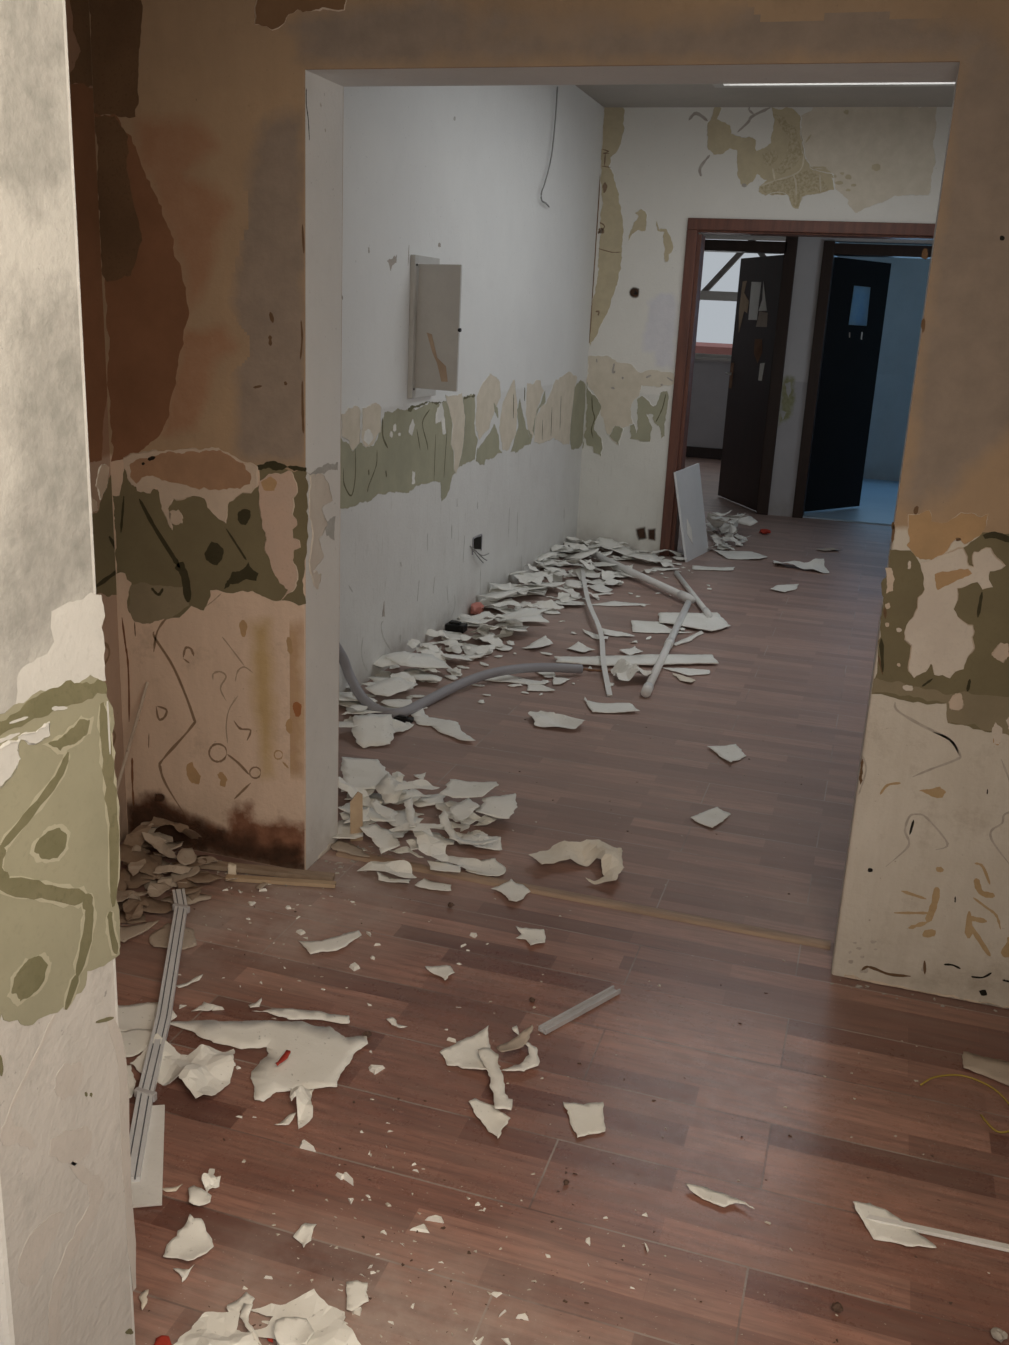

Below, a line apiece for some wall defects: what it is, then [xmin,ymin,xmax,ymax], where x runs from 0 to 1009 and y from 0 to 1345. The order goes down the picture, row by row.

peeling [254,0,347,31]
flaking render [689,107,937,213]
peeling [589,107,673,362]
peeling [390,419,415,438]
peeling [435,402,446,435]
peeling [91,465,109,512]
peeling [169,510,182,525]
flaking render [883,506,988,632]
peeling [992,643,1009,662]
peeling [949,694,963,710]
peeling [0,706,67,786]